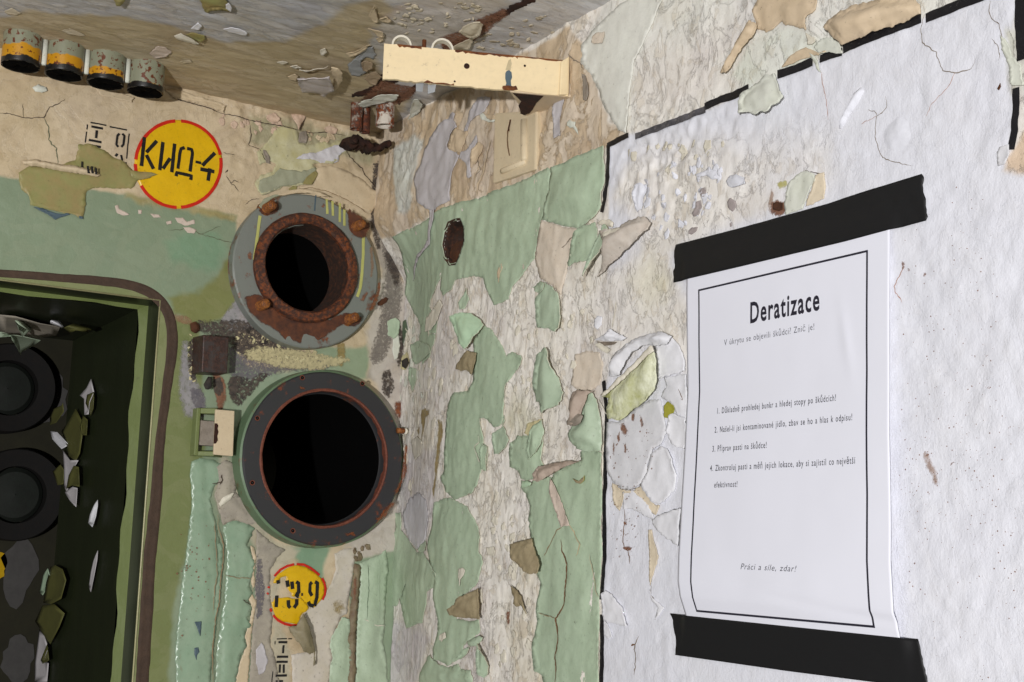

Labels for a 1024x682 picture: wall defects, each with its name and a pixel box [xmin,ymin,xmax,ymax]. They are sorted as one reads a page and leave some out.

peeling [223,27,247,36]
peeling [277,2,483,97]
peeling [720,0,921,114]
crack [3,99,65,160]
peeling [19,143,158,220]
corrosion [245,209,388,343]
peeling [289,96,745,682]
peeling [175,458,285,682]